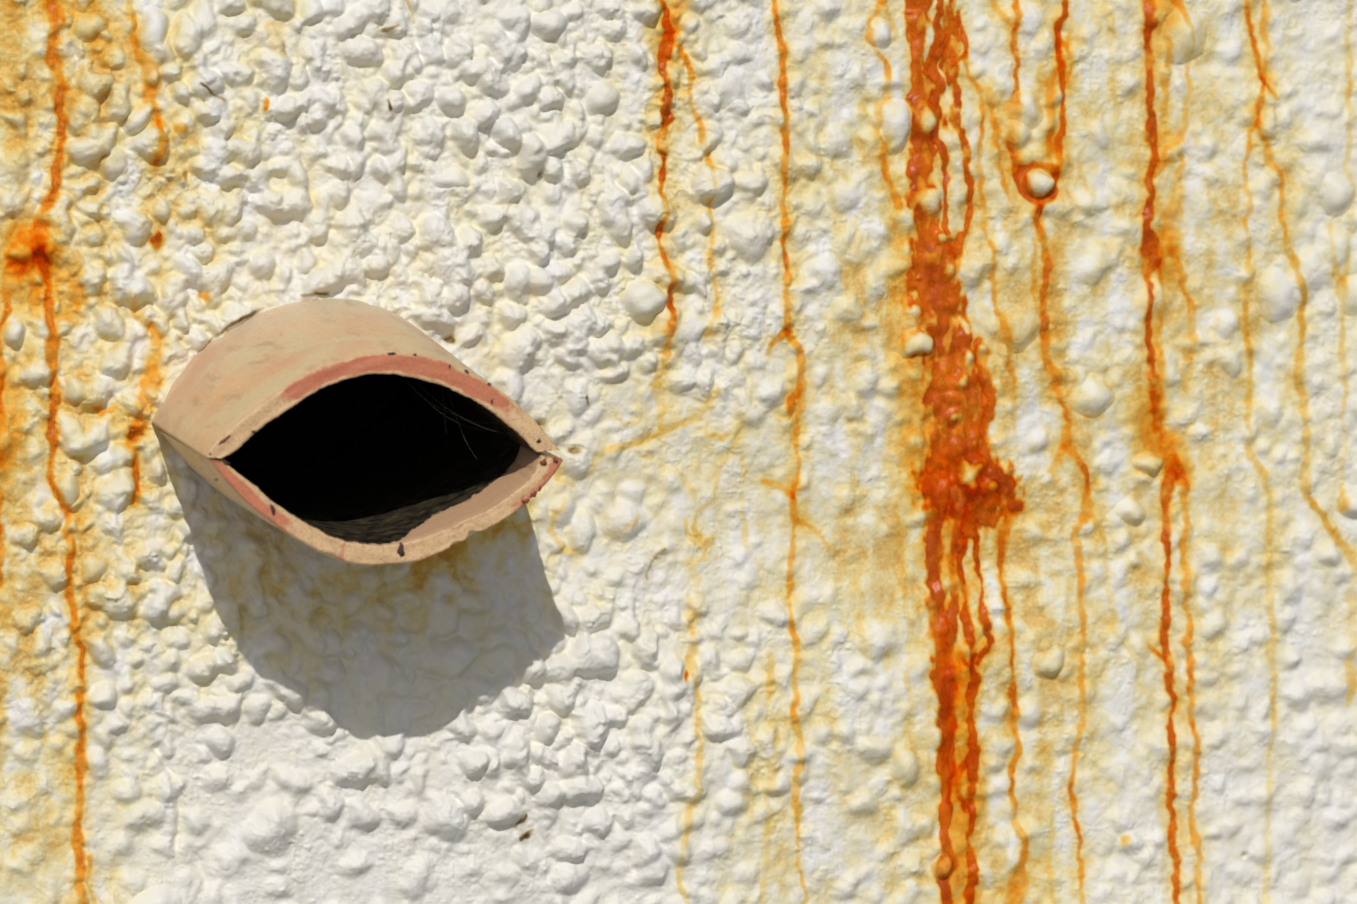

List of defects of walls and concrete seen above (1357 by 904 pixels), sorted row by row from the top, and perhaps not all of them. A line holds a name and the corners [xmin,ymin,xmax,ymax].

corrosion [658,8,674,126]
corrosion [1054,2,1068,148]
corrosion [1144,3,1158,50]
corrosion [51,152,61,201]
corrosion [1014,164,1058,224]
corrosion [1142,72,1161,267]
corrosion [1146,283,1154,367]
corrosion [46,403,57,448]
corrosion [905,0,1023,904]
corrosion [1161,531,1171,568]
corrosion [1161,589,1171,654]
corrosion [1165,673,1177,814]